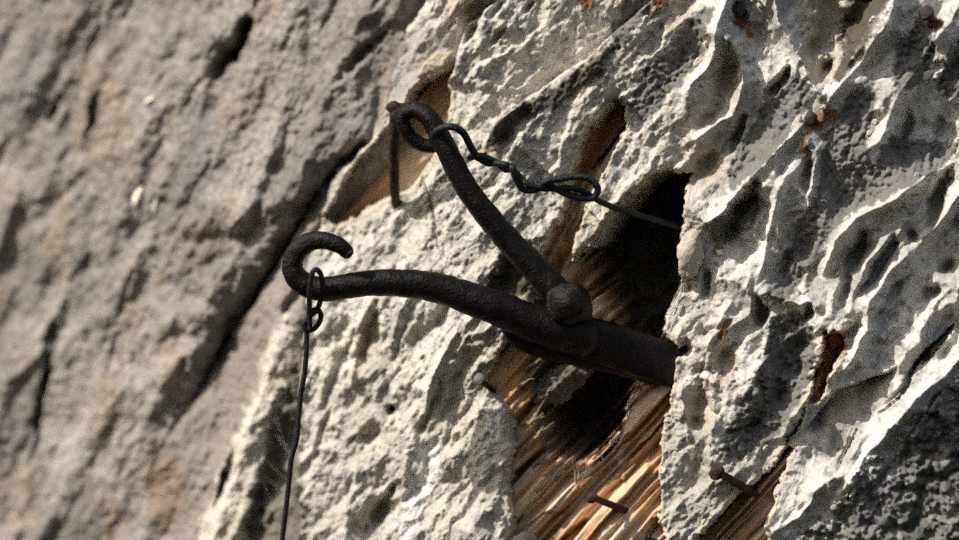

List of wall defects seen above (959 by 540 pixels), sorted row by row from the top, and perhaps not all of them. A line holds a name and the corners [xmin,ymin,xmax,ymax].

corrosion [579,0,596,15]
corrosion [732,16,753,38]
spalling [400,64,456,134]
spalling [539,0,735,262]
corrosion [802,109,837,153]
spalling [321,118,440,231]
spalling [479,338,516,540]
spalling [657,279,690,540]
corrosion [819,330,847,393]
crack [836,427,857,469]
crack [877,323,954,438]